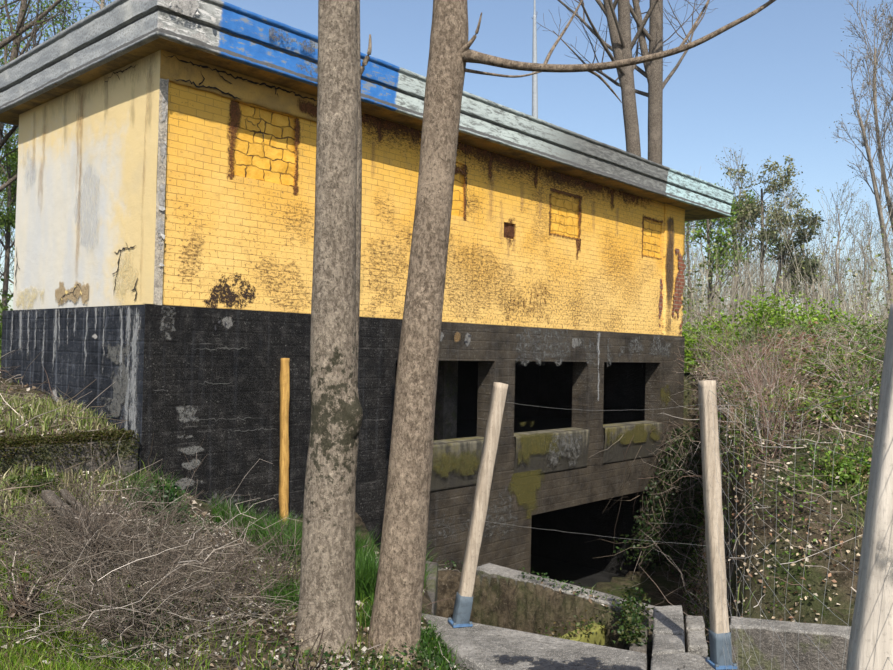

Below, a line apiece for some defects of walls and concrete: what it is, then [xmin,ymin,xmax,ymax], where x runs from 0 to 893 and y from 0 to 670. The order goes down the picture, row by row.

crack [166,55,317,101]
water stain [10,308,105,362]
spalling [55,281,89,306]
crack [112,242,138,301]
water stain [204,257,311,313]
water stain [445,234,550,323]
water stain [566,231,653,398]
water stain [120,307,139,439]